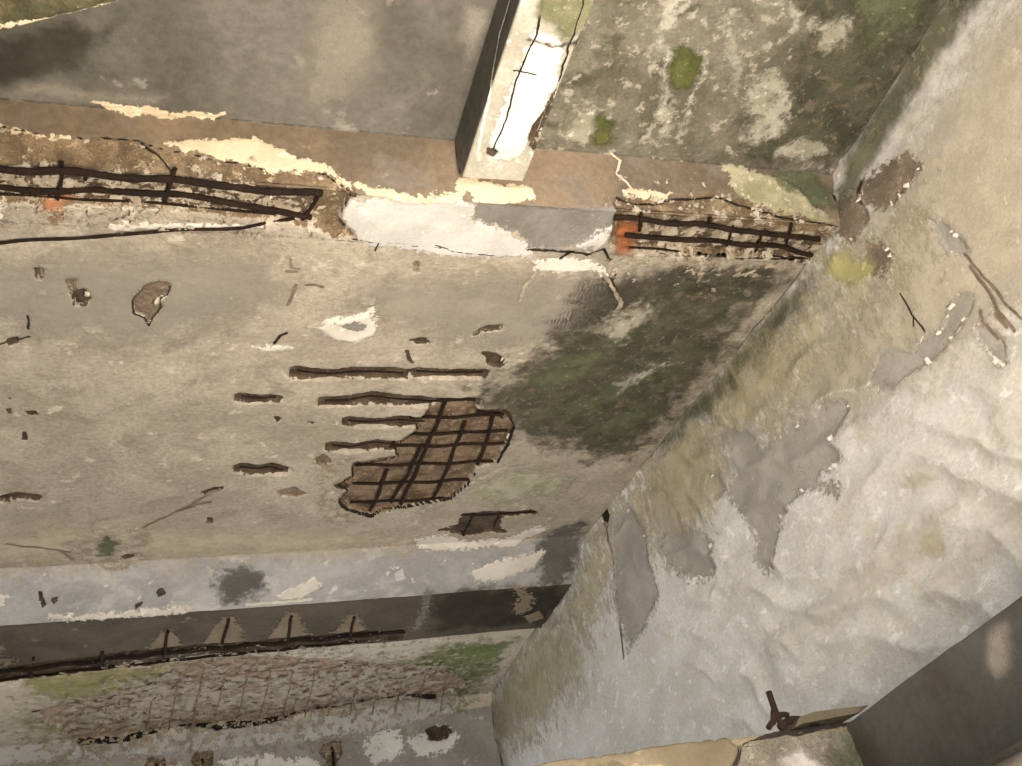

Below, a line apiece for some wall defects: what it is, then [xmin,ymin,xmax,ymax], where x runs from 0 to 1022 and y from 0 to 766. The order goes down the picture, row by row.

spalling [0,125,355,245]
crack [610,152,633,191]
peeling [473,151,923,293]
damp [373,0,1022,757]
spalling [313,395,516,518]
damp [0,521,106,569]
damp [210,565,313,606]
spalling [438,509,539,537]
spalling [0,610,518,766]